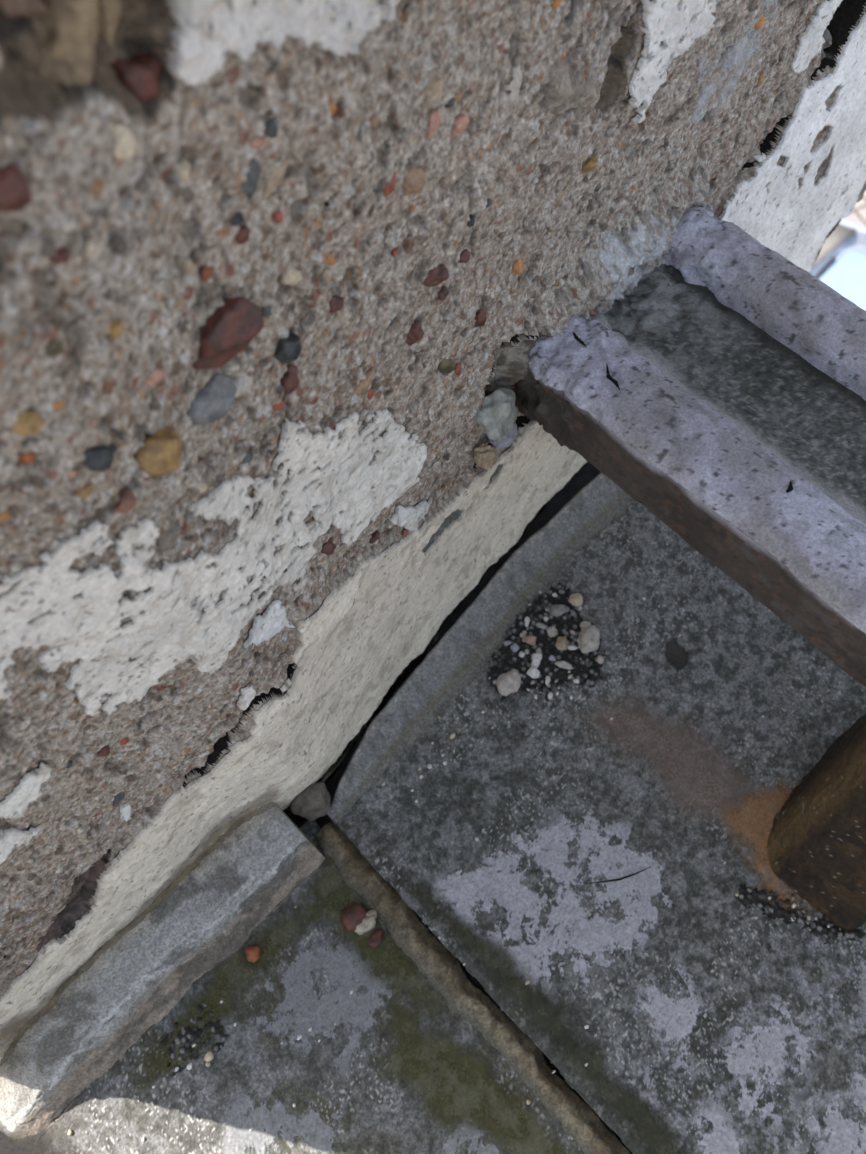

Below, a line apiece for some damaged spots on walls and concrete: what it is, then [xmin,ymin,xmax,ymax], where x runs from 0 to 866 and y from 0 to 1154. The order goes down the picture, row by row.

peeling [0,0,400,121]
peeling [595,0,718,123]
crack [810,0,866,80]
crack [739,114,792,171]
crack [183,663,296,787]
peeling [0,409,587,1062]